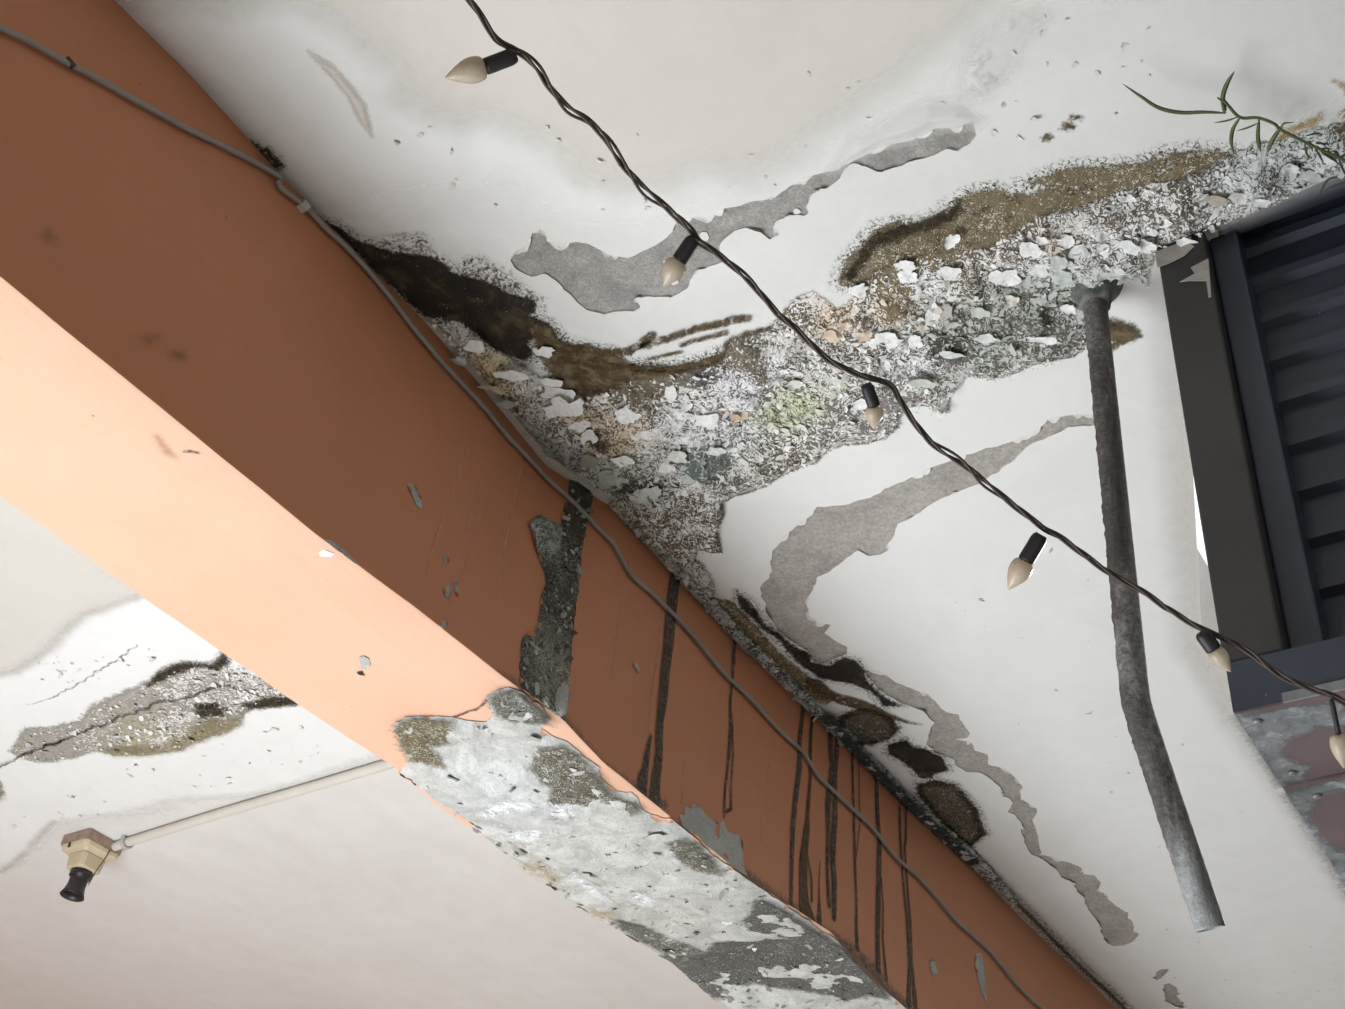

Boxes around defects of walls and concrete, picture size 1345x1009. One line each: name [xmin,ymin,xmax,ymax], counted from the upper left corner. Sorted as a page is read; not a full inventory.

damp [130,0,1345,400]
spalling [318,539,357,564]
spalling [393,120,1345,1009]
crack [40,645,137,702]
crack [0,685,230,768]
spalling [8,653,298,763]
damp [563,250,1345,1009]